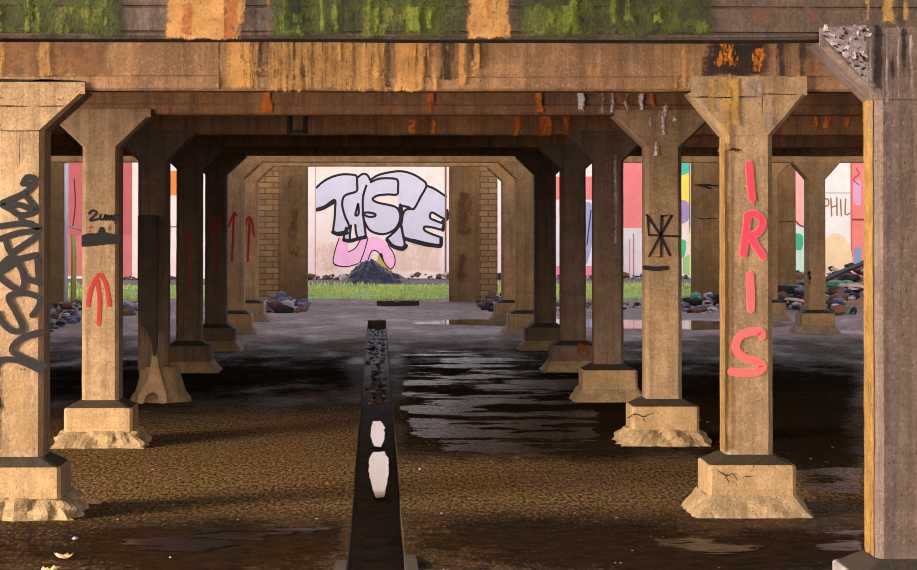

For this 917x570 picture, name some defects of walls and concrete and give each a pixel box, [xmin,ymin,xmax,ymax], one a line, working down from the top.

corrosion [165,0,245,40]
corrosion [467,0,511,39]
water stain [217,3,482,92]
corrosion [716,44,738,67]
corrosion [752,48,765,72]
peeling [819,24,872,82]
water stain [403,0,913,570]